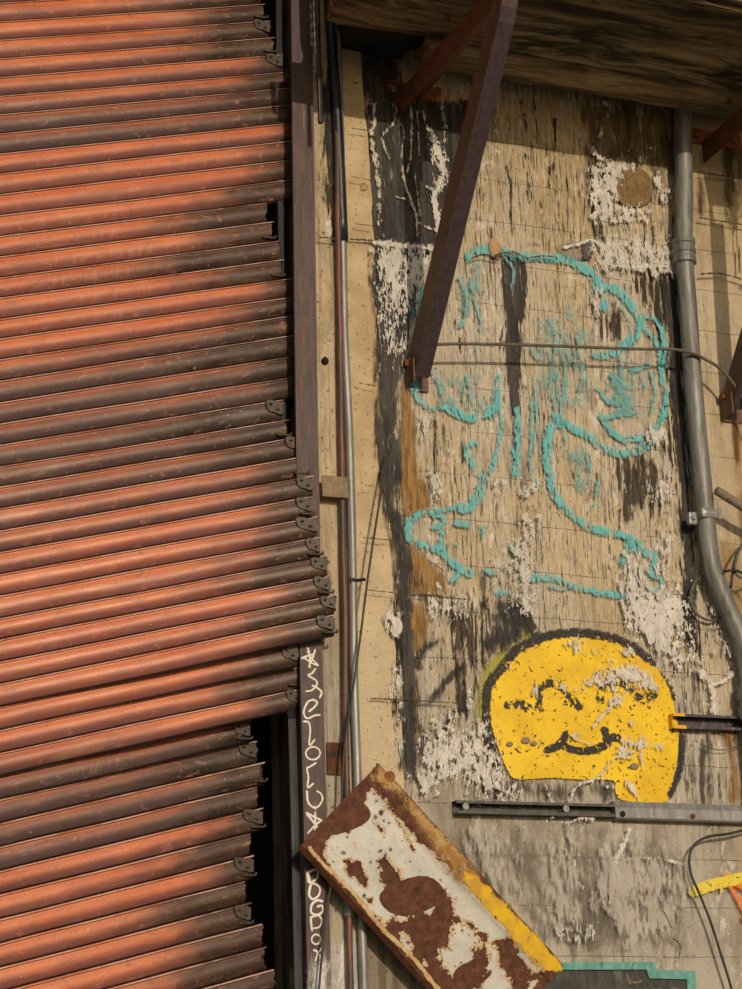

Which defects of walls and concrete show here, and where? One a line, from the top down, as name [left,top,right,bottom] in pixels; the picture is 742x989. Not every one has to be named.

peeling [617,169,653,207]
spalling [506,737,537,746]
rust [297,763,563,989]